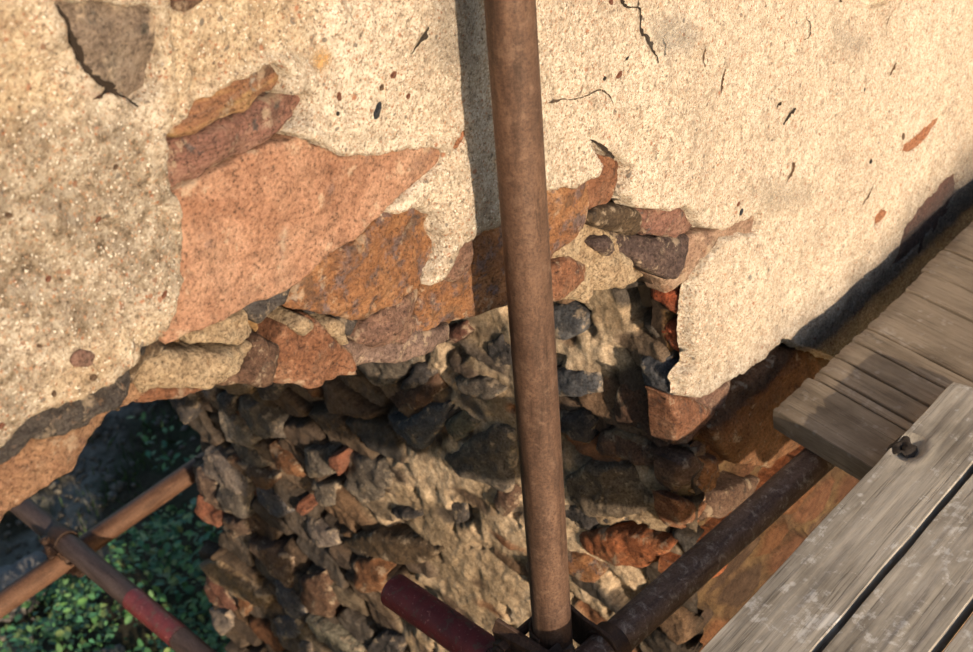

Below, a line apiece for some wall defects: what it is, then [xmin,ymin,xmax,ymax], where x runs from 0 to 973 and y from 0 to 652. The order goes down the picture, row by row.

crack [620,0,667,63]
spalling [133,64,507,403]
spalling [547,154,754,304]